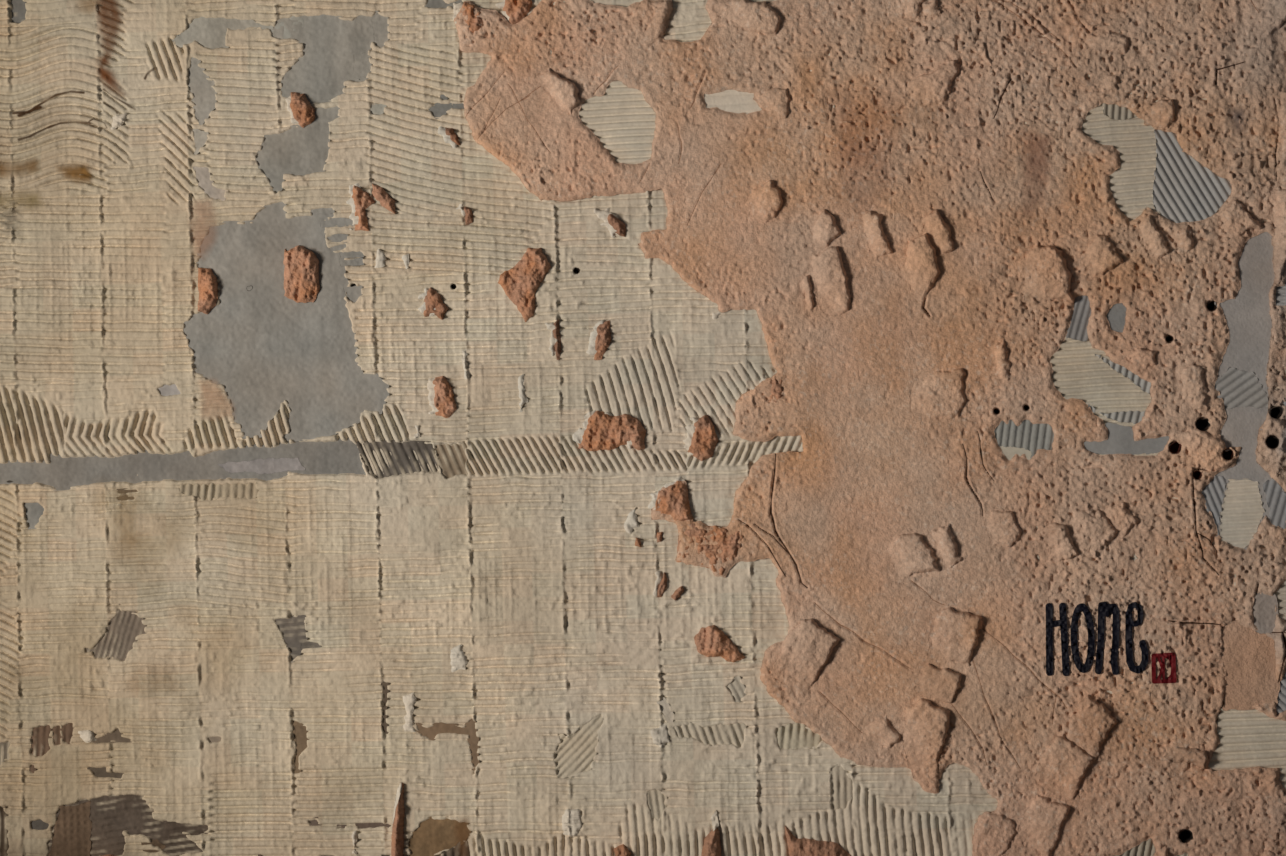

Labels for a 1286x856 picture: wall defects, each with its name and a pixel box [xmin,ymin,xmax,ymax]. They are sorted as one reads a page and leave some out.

spalling [579,80,656,165]
spalling [1081,103,1232,223]
peeling [0,11,468,501]
spalling [1050,296,1170,456]
spalling [1202,232,1286,550]
peeling [85,604,147,661]
peeling [275,615,321,663]
peeling [28,723,73,773]
peeling [293,721,309,773]
peeling [416,719,480,773]
spalling [1208,673,1286,789]
peeling [31,795,208,856]